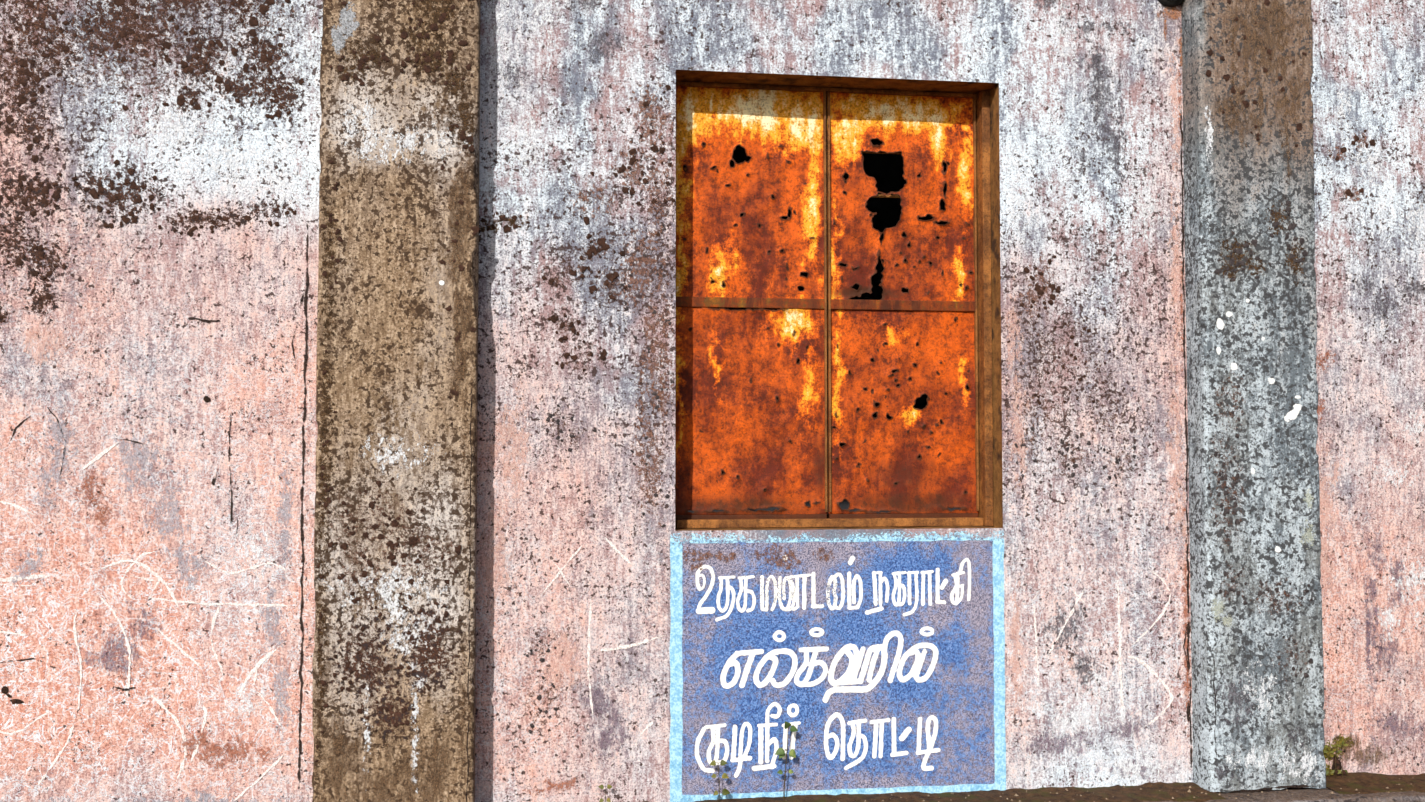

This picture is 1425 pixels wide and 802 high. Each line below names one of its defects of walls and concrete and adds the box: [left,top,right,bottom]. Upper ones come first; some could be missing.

damp [1204,0,1309,286]
damp [1207,366,1314,620]
damp [1225,743,1319,785]
damp [1242,634,1313,721]